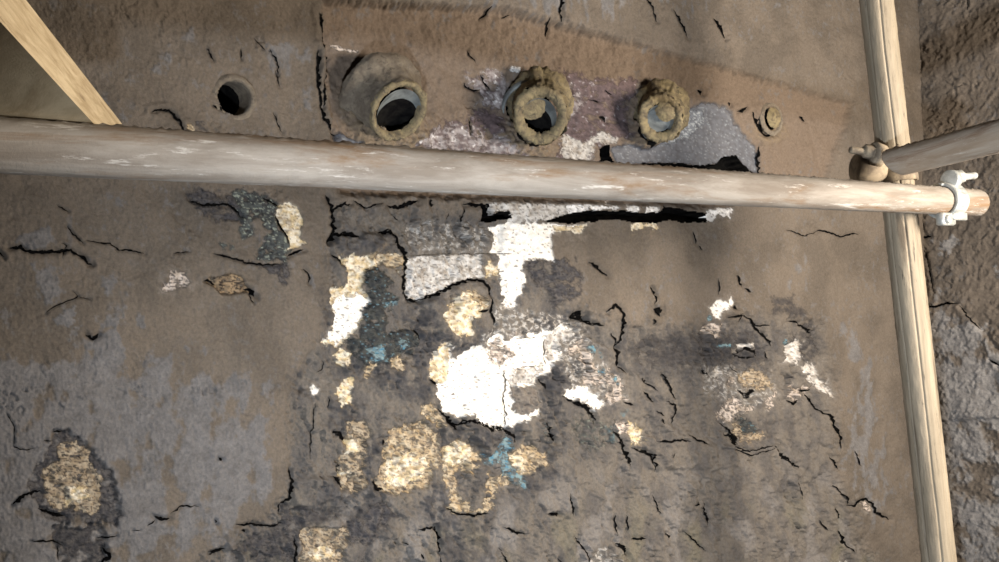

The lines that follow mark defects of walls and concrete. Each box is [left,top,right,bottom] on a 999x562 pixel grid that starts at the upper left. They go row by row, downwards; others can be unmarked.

spalling [611,102,757,173]
crack [0,205,144,265]
spalling [276,202,307,250]
spalling [41,440,105,562]
crack [405,508,524,562]
crack [438,409,516,442]
spalling [320,202,660,514]
crack [538,303,803,562]
spalling [700,298,733,338]
crack [701,275,811,375]
spalling [713,339,833,444]
crack [786,389,889,552]